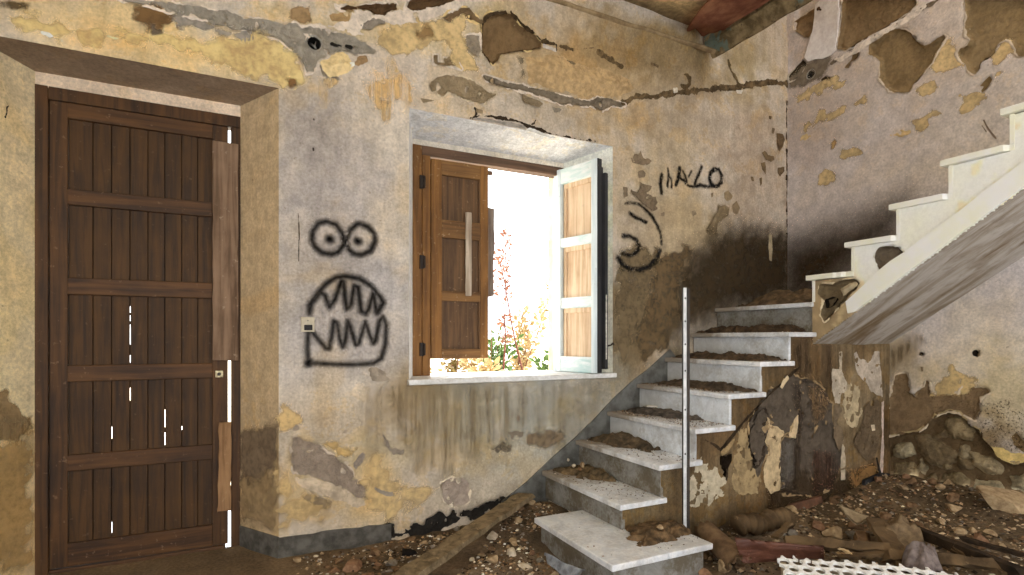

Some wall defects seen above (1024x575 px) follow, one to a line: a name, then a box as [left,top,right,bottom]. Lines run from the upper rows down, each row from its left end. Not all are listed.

peeling [11,0,627,114]
crack [541,38,624,69]
spalling [787,0,1024,114]
crack [470,107,596,142]
crack [621,59,788,272]
peeling [800,95,867,141]
peeling [831,140,862,159]
peeling [890,110,941,137]
leakage [613,210,896,364]
spalling [275,404,394,528]
spalling [382,434,404,455]
spalling [583,351,1024,575]